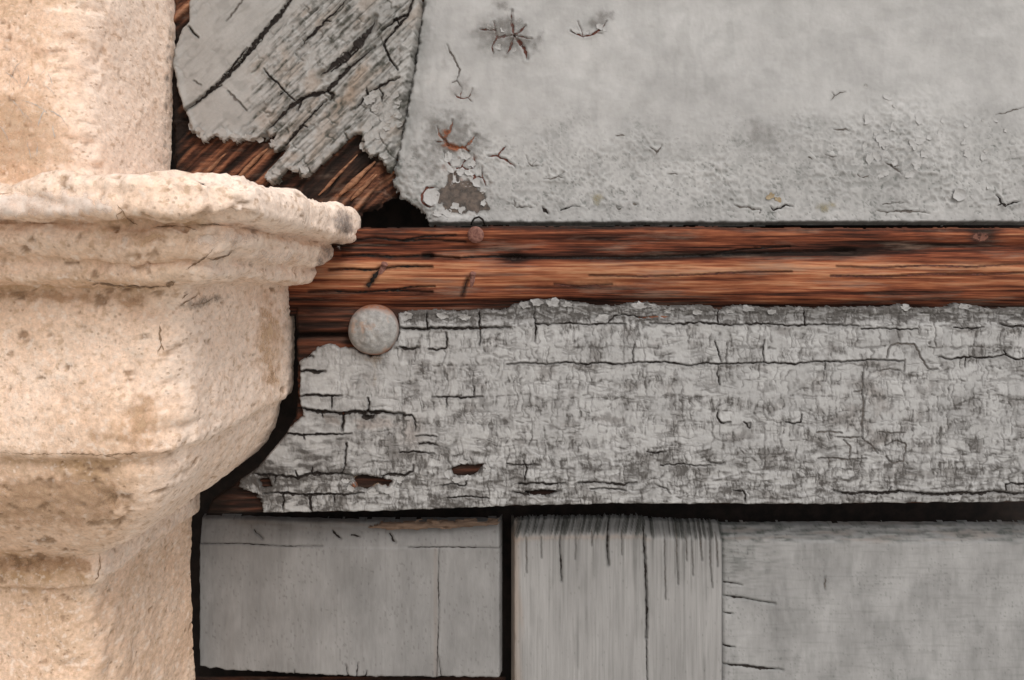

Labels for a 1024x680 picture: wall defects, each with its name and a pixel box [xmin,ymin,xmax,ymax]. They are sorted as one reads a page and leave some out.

crack [189,0,414,145]
spalling [322,22,375,74]
peeling [188,123,277,148]
peeling [359,90,404,159]
peeling [264,165,309,180]
peeling [433,151,490,217]
peeling [519,297,573,309]
crack [399,310,504,351]
crack [438,386,483,403]
crack [530,311,1024,496]
crack [252,355,436,512]
crack [507,462,636,496]